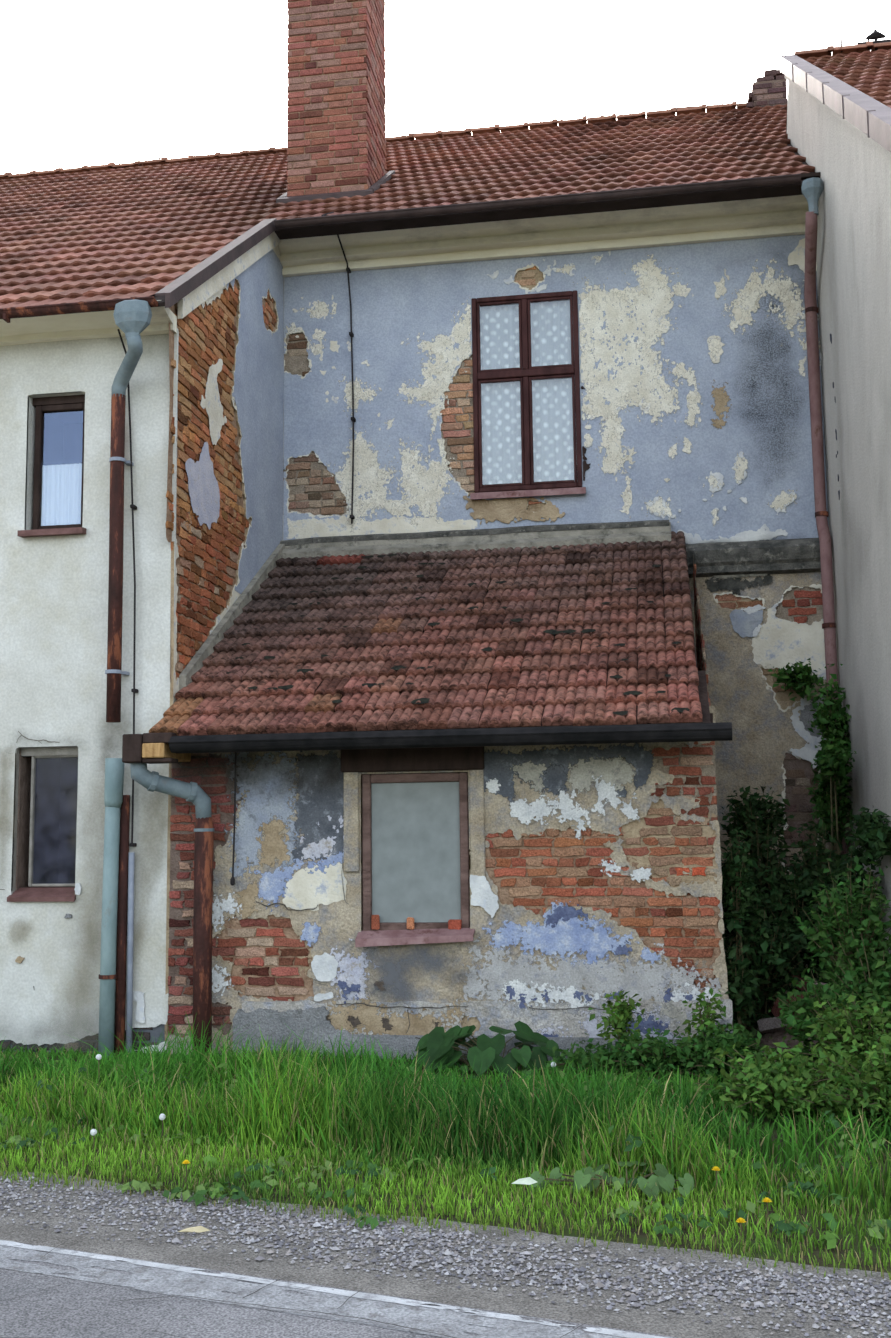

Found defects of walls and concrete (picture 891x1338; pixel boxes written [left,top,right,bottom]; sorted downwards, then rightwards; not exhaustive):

flaking render [165,281,252,684]
peeling [262,291,565,539]
peeling [487,246,797,544]
peeling [707,238,832,377]
peeling [713,574,826,869]
flaking render [0,1032,99,1053]
flaking render [125,753,481,1053]
peeling [501,979,624,1012]
flaking render [470,741,722,1002]
peeling [613,1012,673,1036]
crack [3,1240,455,1338]